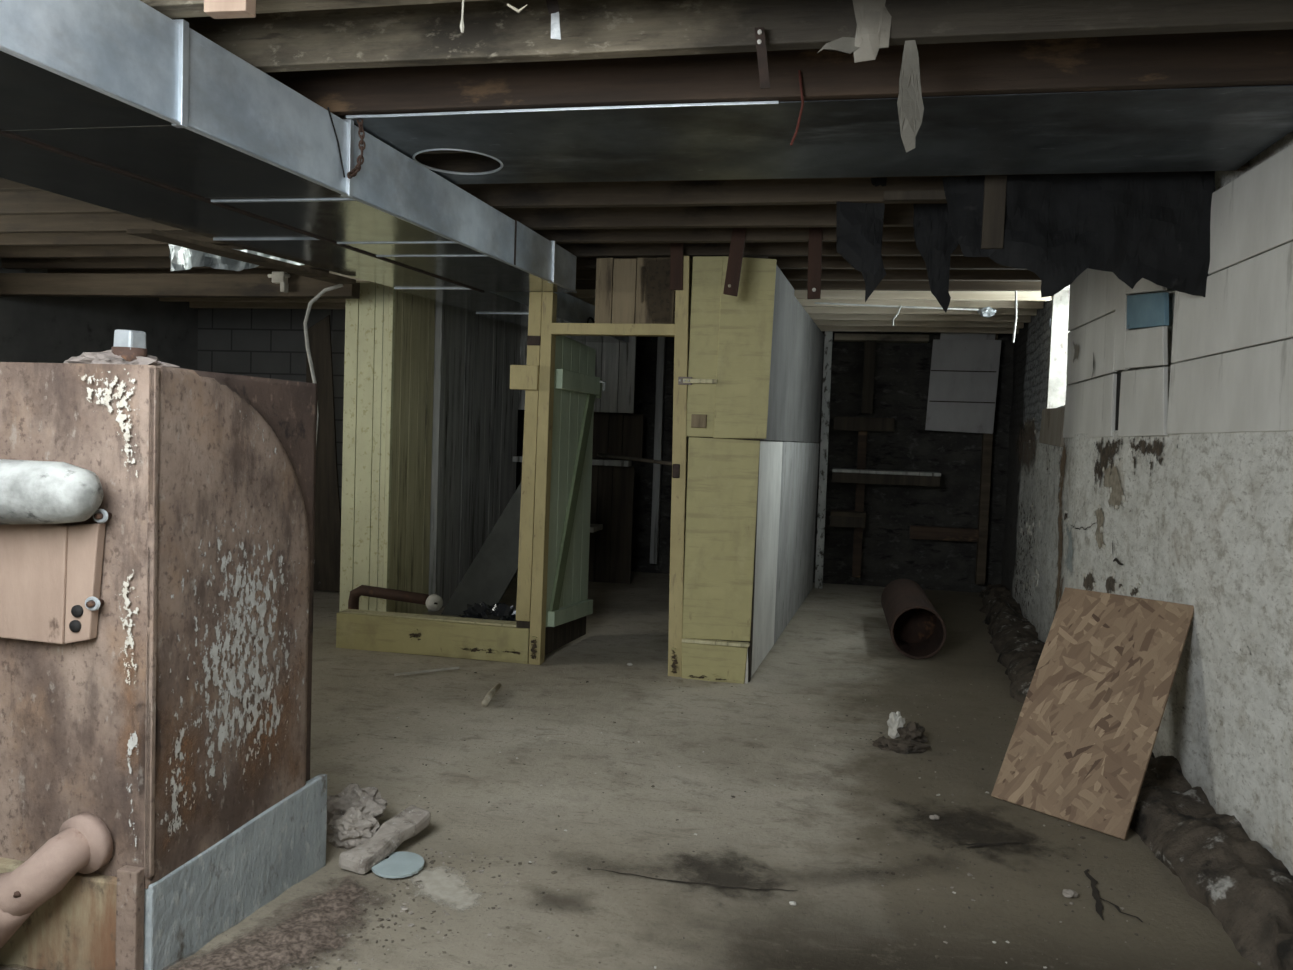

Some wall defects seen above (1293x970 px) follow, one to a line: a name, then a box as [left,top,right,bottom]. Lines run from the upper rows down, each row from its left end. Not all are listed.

spalling [1093,460,1125,549]
spalling [1083,569,1141,598]
damp [911,809,1039,858]
damp [677,852,777,894]